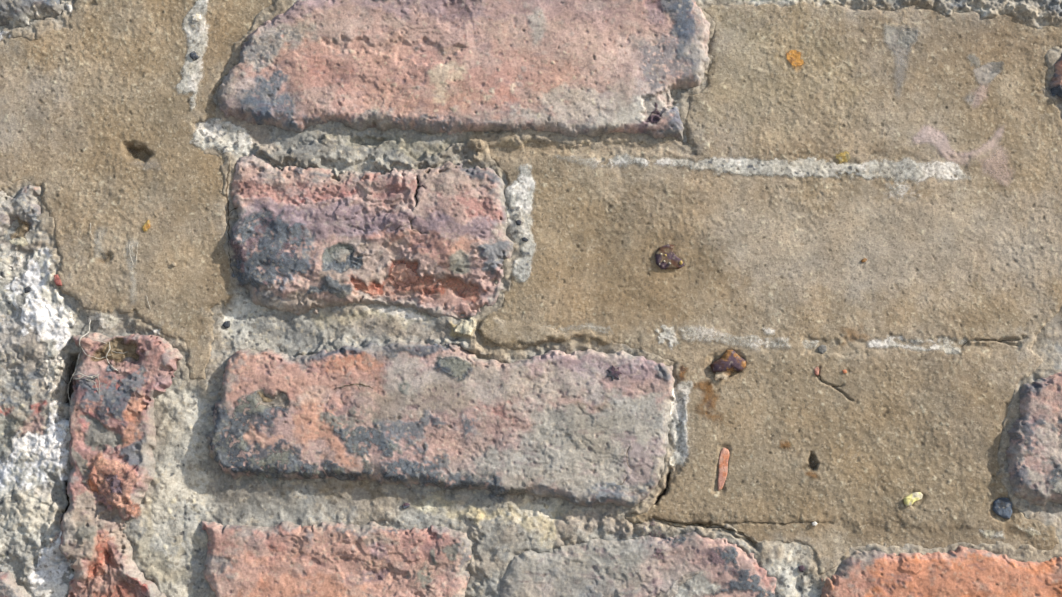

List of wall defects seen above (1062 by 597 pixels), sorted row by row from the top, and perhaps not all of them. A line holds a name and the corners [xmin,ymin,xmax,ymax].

crack [654,470,828,544]